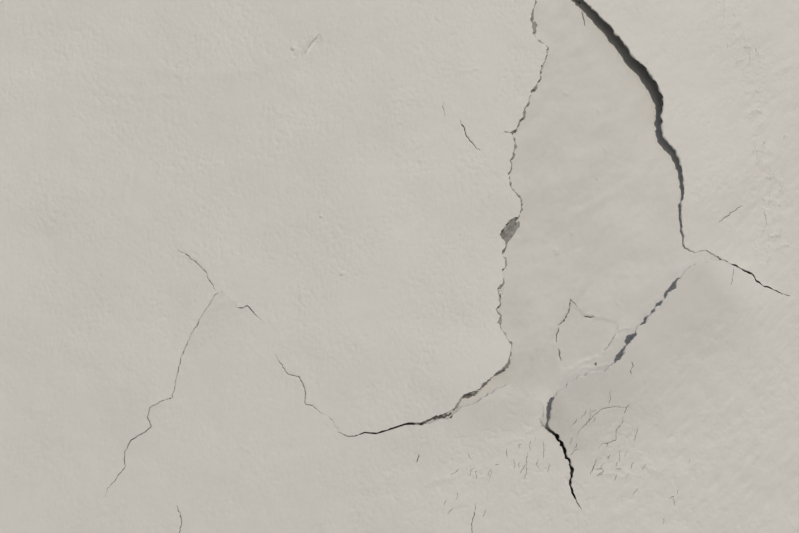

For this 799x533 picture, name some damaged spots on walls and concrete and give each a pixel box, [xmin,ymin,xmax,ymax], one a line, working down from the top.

peeling [329,0,799,533]
crack [730,265,790,296]
crack [277,358,421,437]
crack [451,397,645,508]